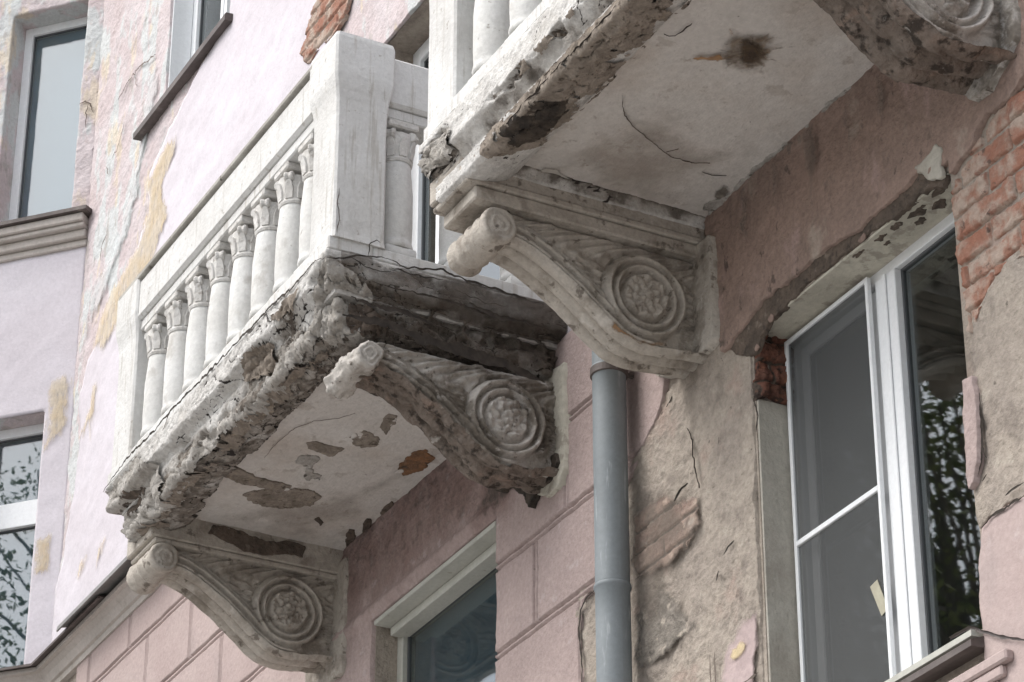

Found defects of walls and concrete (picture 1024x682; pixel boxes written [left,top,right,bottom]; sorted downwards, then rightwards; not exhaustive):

flaking render [299,0,352,64]
peeling [143,66,157,120]
spalling [474,0,691,159]
peeling [417,127,457,181]
crack [622,101,727,176]
peeling [90,134,175,347]
spalling [105,255,397,547]
flaking render [628,86,1024,682]
flaking render [394,449,435,476]
crack [674,428,700,501]
flaking render [575,583,596,682]